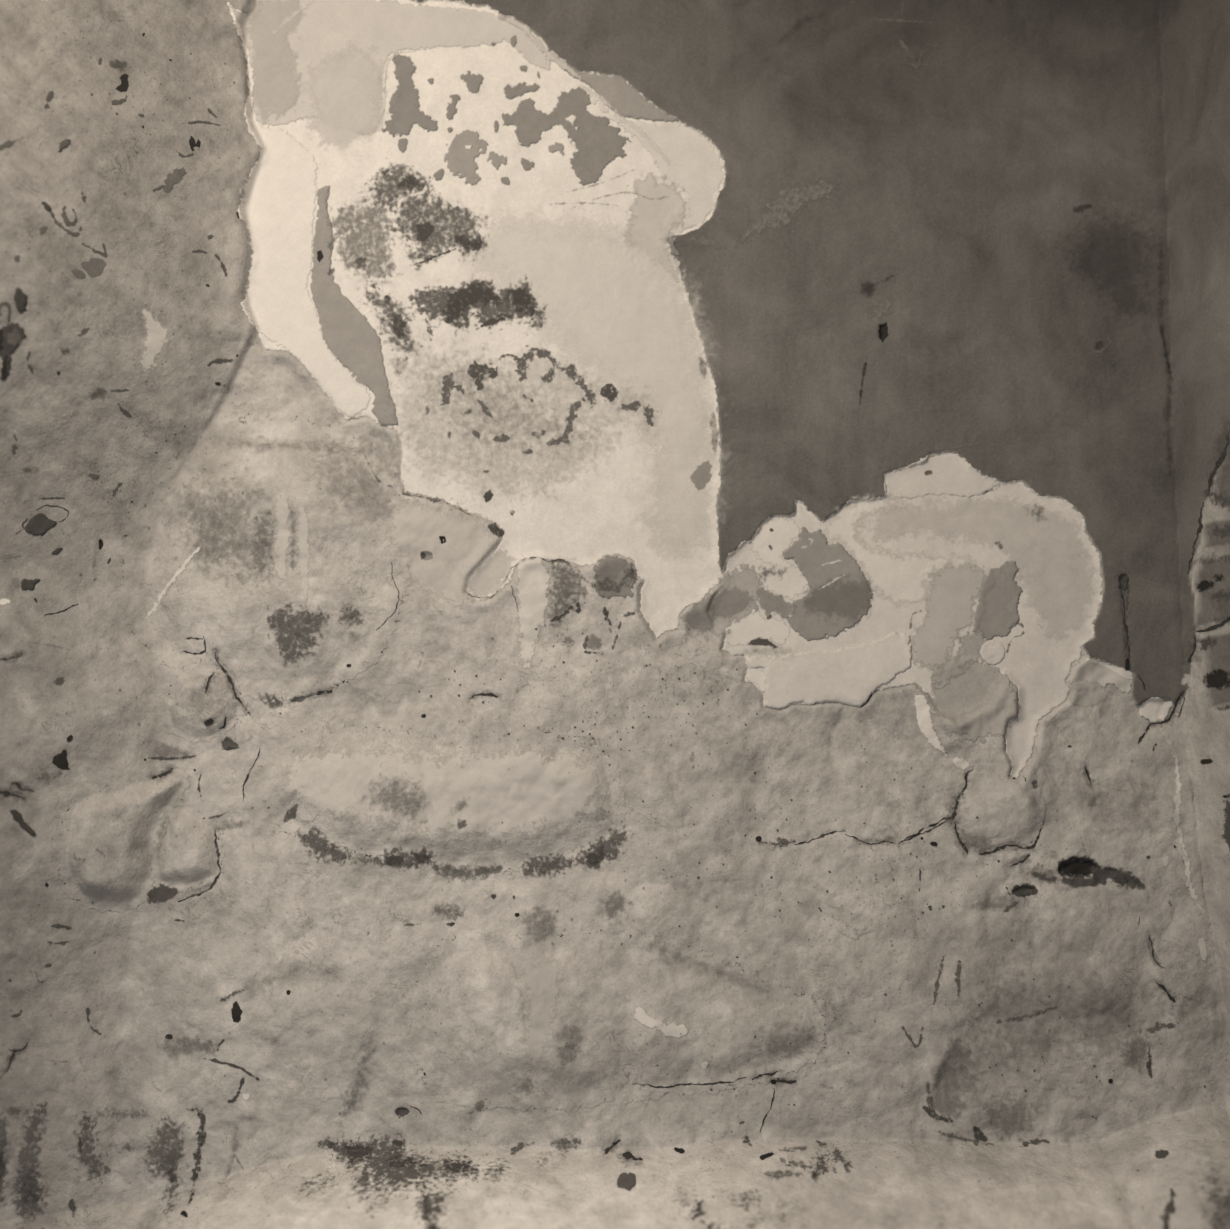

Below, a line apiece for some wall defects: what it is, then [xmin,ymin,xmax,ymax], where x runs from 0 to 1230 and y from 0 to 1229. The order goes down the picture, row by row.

flaking render [227,0,1133,778]
spalling [149,743,196,760]
spalling [221,736,239,750]
flaking render [1138,694,1185,751]
crack [756,770,1043,867]
spalling [1160,1189,1176,1229]